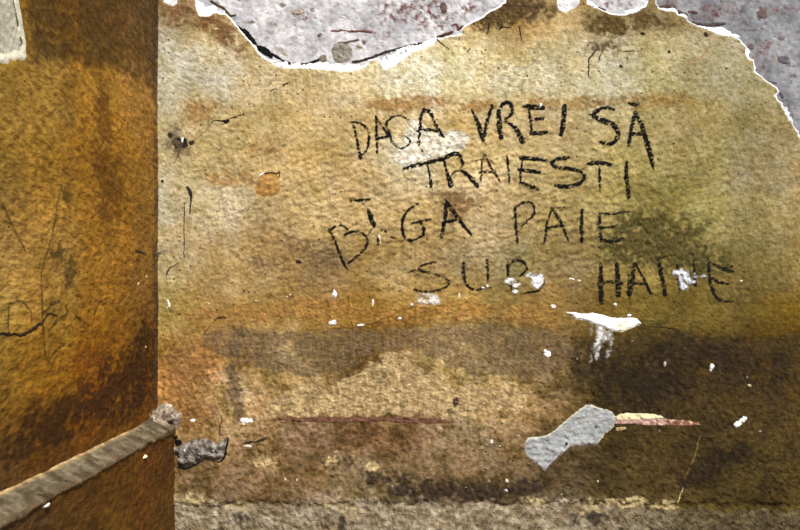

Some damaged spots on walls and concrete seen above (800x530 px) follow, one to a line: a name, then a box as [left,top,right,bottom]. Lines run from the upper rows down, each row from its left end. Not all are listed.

peeling [0,0,27,64]
peeling [194,0,506,72]
peeling [557,0,800,137]
leakage [51,245,76,286]
crack [0,313,57,337]
peeling [567,312,674,361]
leakage [3,320,155,458]
leakage [226,329,244,421]
spalling [174,418,228,470]
spalling [524,404,616,472]